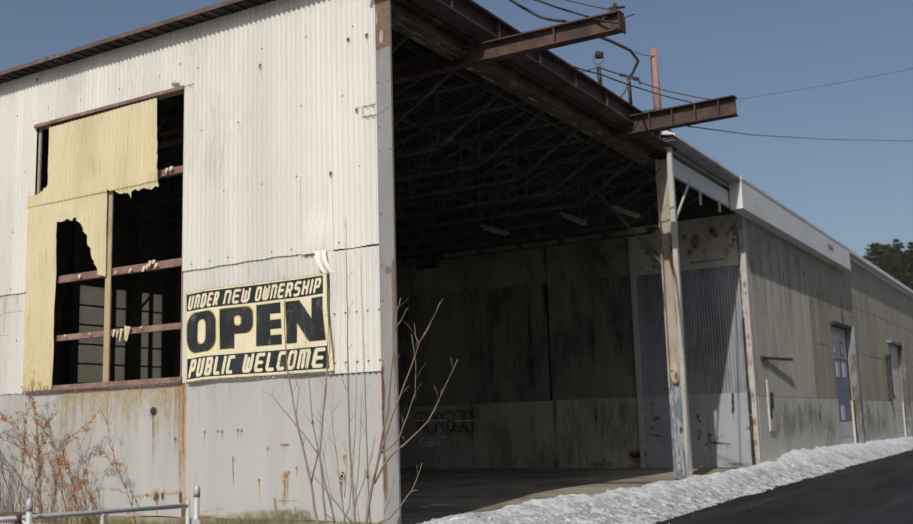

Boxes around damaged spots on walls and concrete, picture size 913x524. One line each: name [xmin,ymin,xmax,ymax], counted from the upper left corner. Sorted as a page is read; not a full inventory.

rust [60,382,185,466]
rust [135,490,186,517]